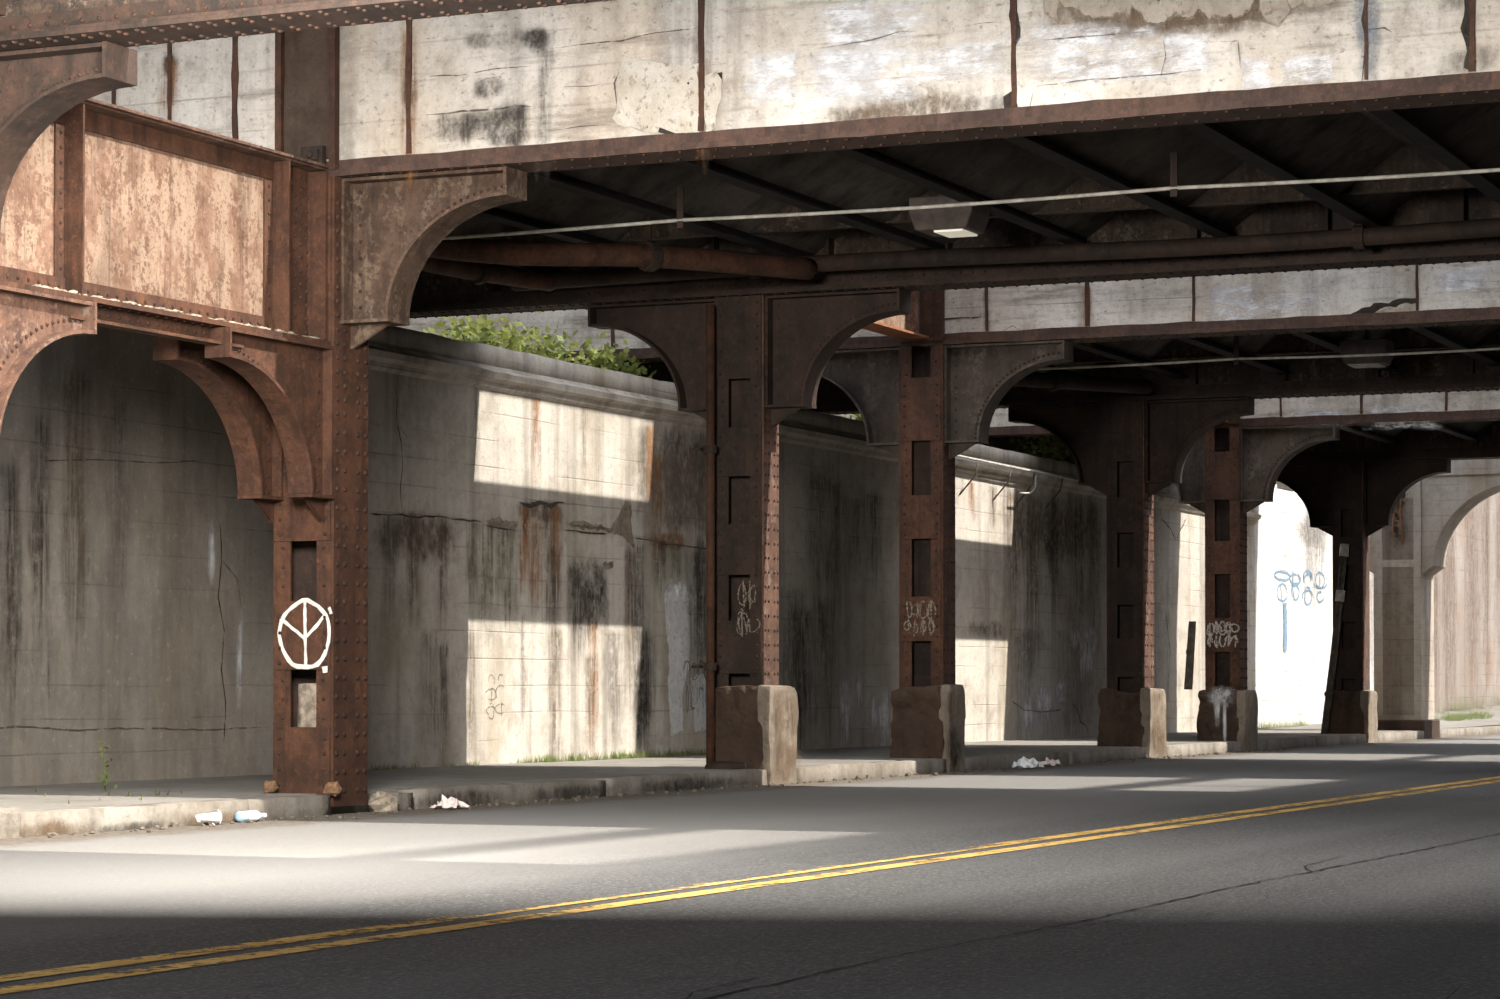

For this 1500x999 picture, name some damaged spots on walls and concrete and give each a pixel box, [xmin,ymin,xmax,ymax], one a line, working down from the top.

damp [459,30,547,145]
spalling [613,58,722,135]
spalling [1003,92,1033,108]
spalling [1009,0,1334,80]
peeling [1244,57,1330,90]
damp [381,518,450,600]
corrosion [520,504,560,617]
damp [693,542,706,665]
damp [552,564,604,732]
corrosion [587,632,598,716]